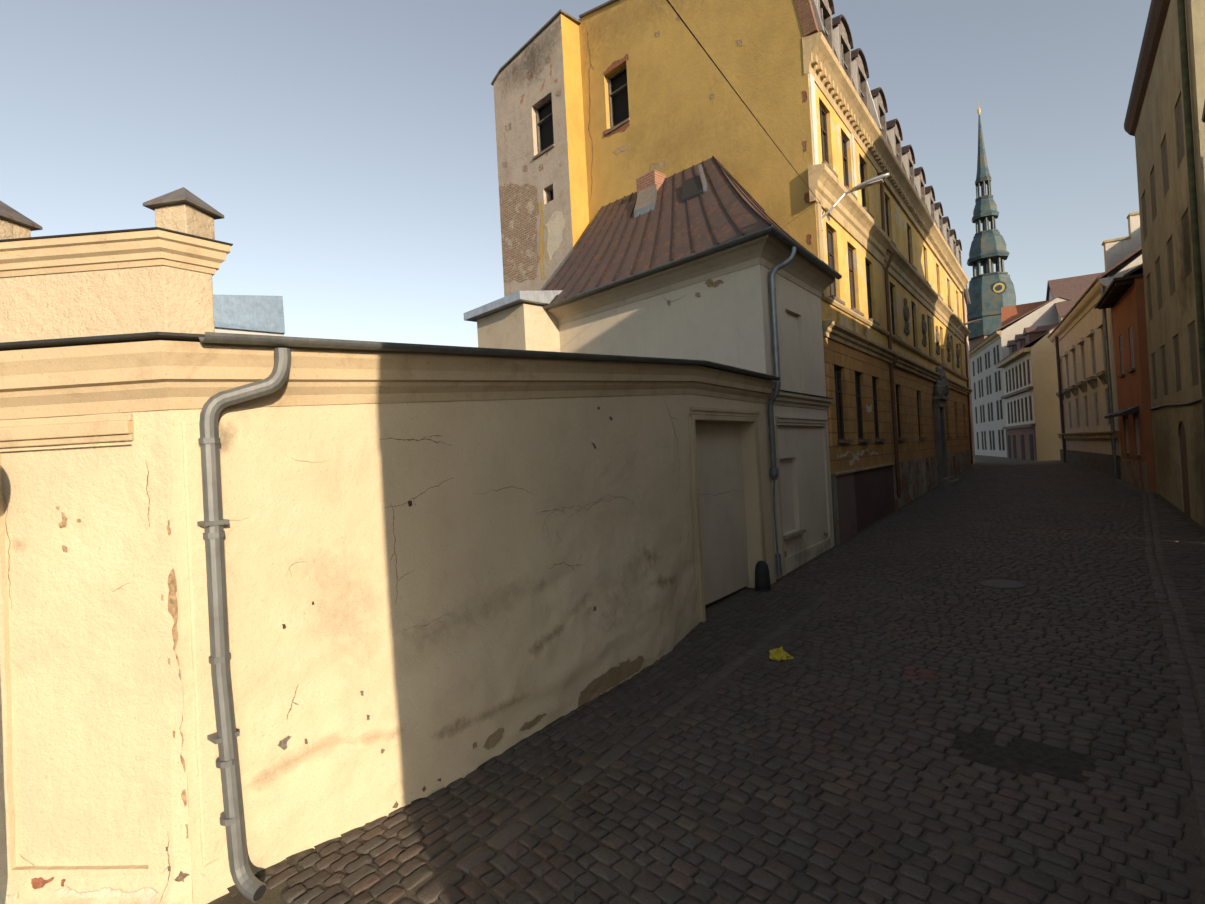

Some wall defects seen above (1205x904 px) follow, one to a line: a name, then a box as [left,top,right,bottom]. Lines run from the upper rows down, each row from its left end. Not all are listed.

peeling [499,164,565,283]
crack [379,435,447,445]
crack [385,478,639,630]
peeling [161,569,181,680]
spalling [578,656,644,706]
spalling [473,728,504,750]
spalling [519,713,546,731]
peeling [31,877,159,904]